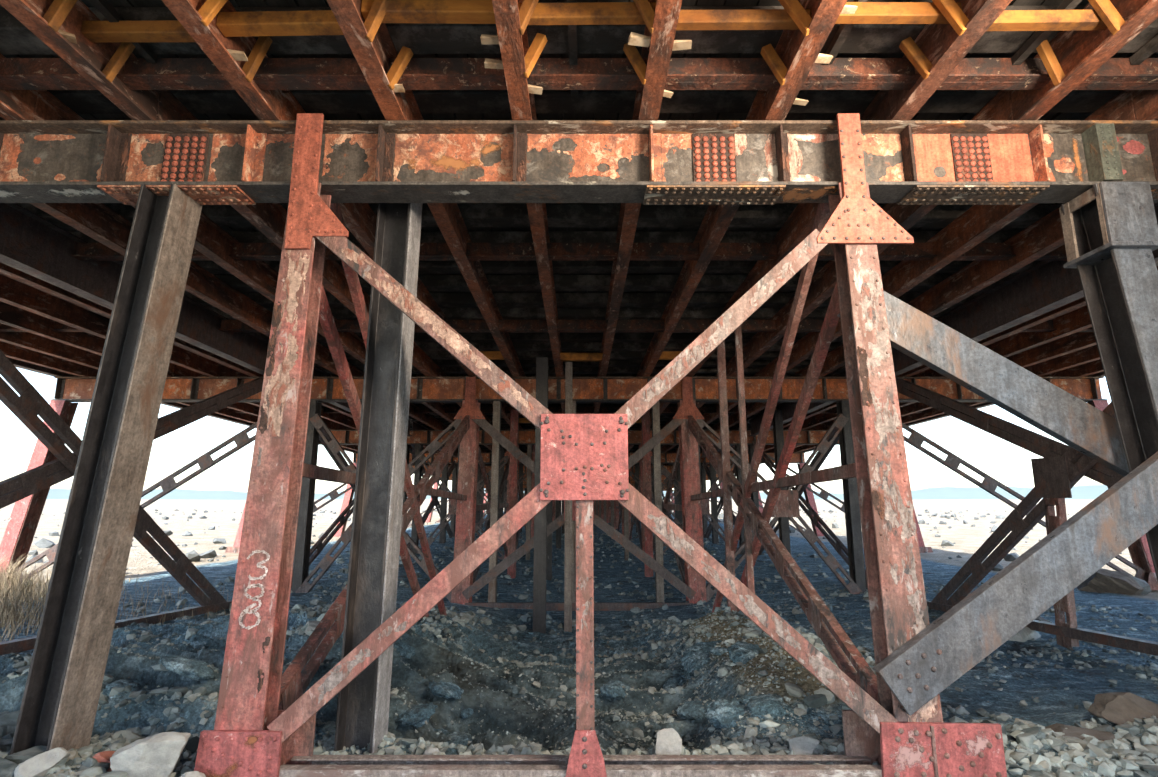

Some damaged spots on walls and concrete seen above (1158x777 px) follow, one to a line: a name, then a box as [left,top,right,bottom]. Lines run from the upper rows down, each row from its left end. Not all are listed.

peeling [0,134,75,181]
peeling [54,165,102,181]
peeling [393,134,513,181]
peeling [527,134,693,181]
rust [1073,140,1083,181]
rust [773,186,837,202]
rust [265,301,282,376]
rust [857,346,873,407]
rust [258,406,267,434]
rust [872,490,885,520]
rust [890,731,930,771]
rust [966,731,990,756]